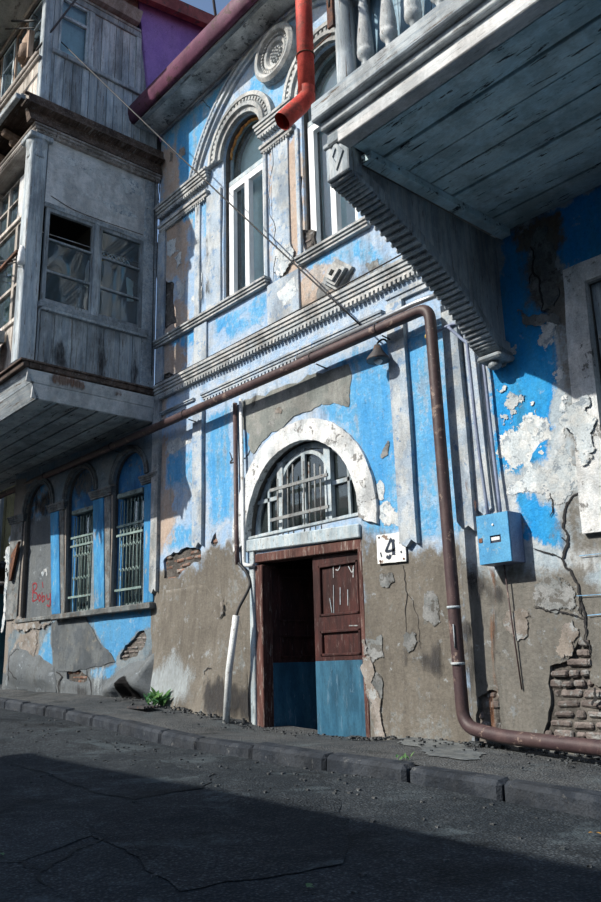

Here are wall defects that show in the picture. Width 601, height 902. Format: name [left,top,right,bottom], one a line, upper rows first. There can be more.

flaking render [156,271,204,329]
peeling [537,322,557,351]
spalling [243,364,352,454]
peeling [496,366,596,505]
spalling [1,538,146,683]
flaking render [165,547,201,579]
spalling [360,635,386,737]
flaking render [479,690,502,728]
flaking render [503,576,601,740]
crack [533,493,590,655]